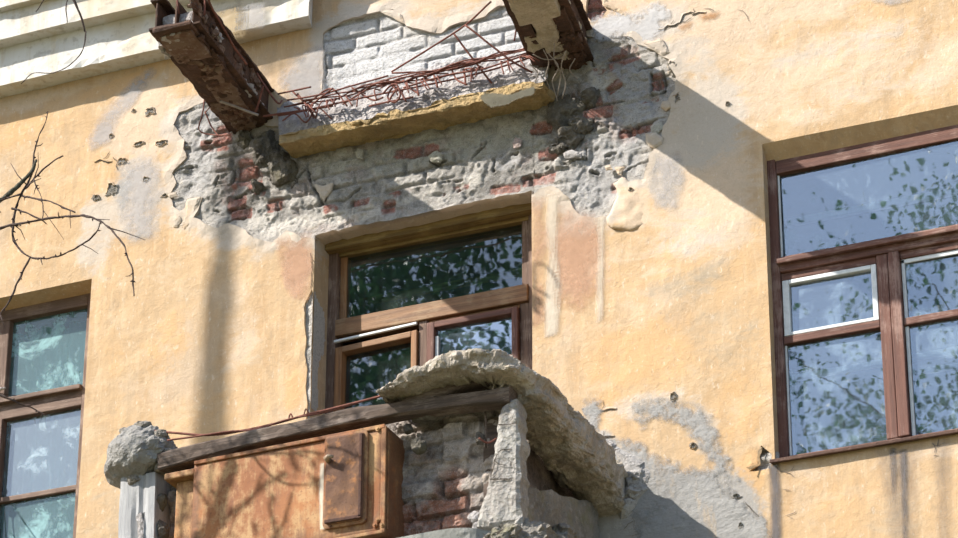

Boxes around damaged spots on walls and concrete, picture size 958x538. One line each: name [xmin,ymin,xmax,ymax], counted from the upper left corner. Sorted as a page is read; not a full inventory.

crack [658,8,749,30]
flaking render [160,0,681,242]
flaking render [91,182,120,201]
peeling [582,401,601,431]
peeling [610,392,769,538]
flaking render [746,446,779,471]
leakage [890,450,906,536]
spalling [483,518,578,538]